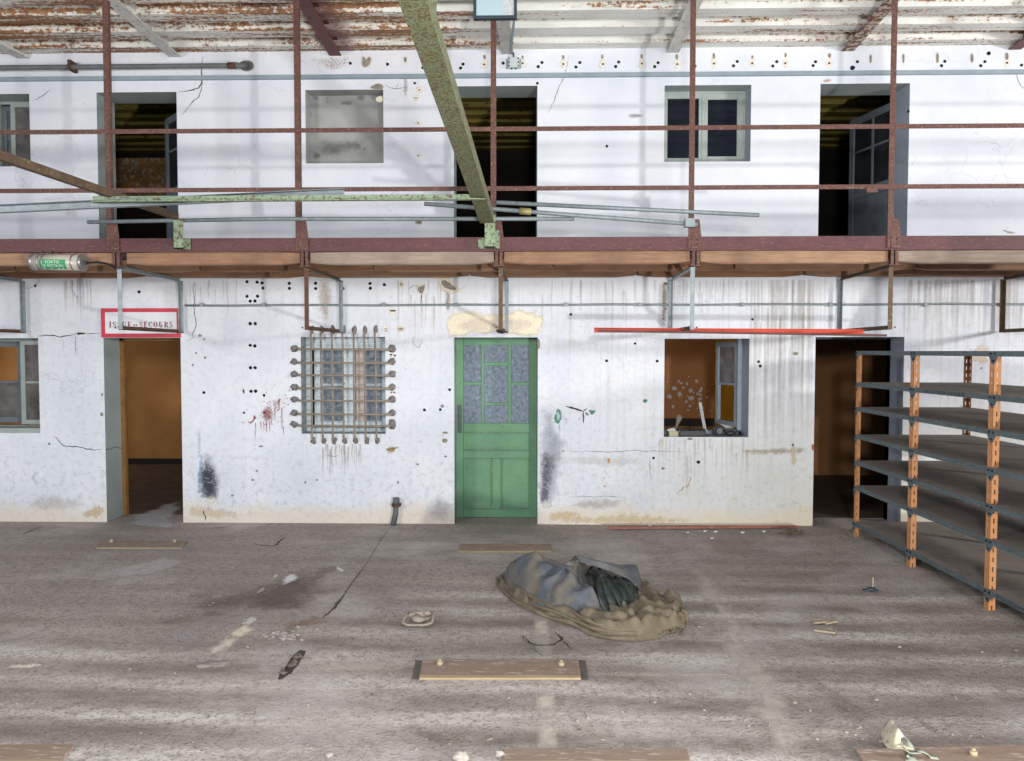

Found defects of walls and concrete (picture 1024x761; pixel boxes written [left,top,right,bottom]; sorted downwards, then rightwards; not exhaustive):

crack [180,58,203,111]
crack [322,527,391,618]